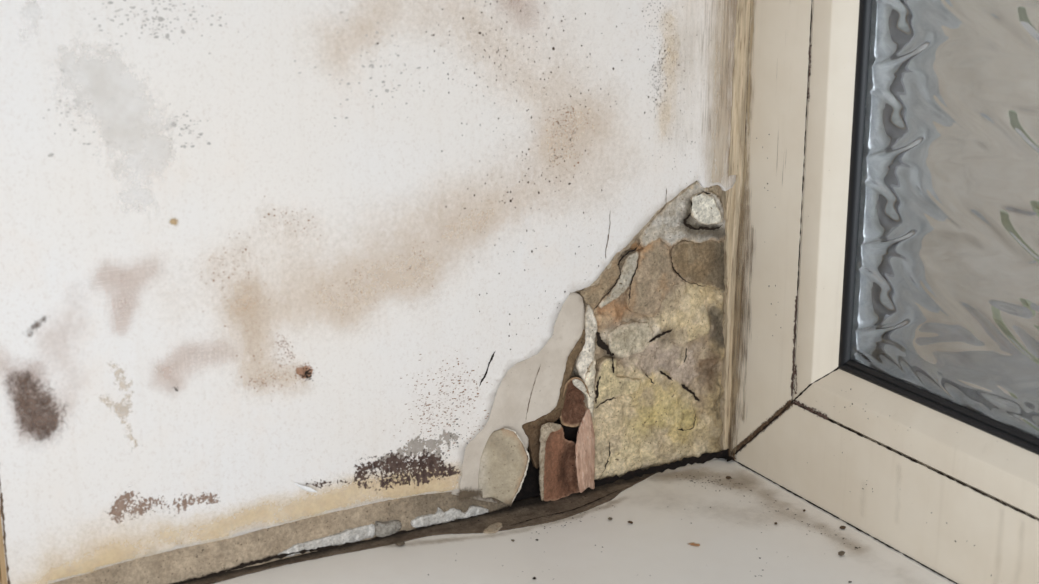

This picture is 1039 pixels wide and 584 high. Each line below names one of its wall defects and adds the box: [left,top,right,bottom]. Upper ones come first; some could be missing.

damp [94,0,227,46]
damp [443,1,617,211]
damp [8,373,62,440]
damp [231,322,320,402]
spalling [51,181,729,584]
damp [105,491,220,523]
damp [44,545,137,582]